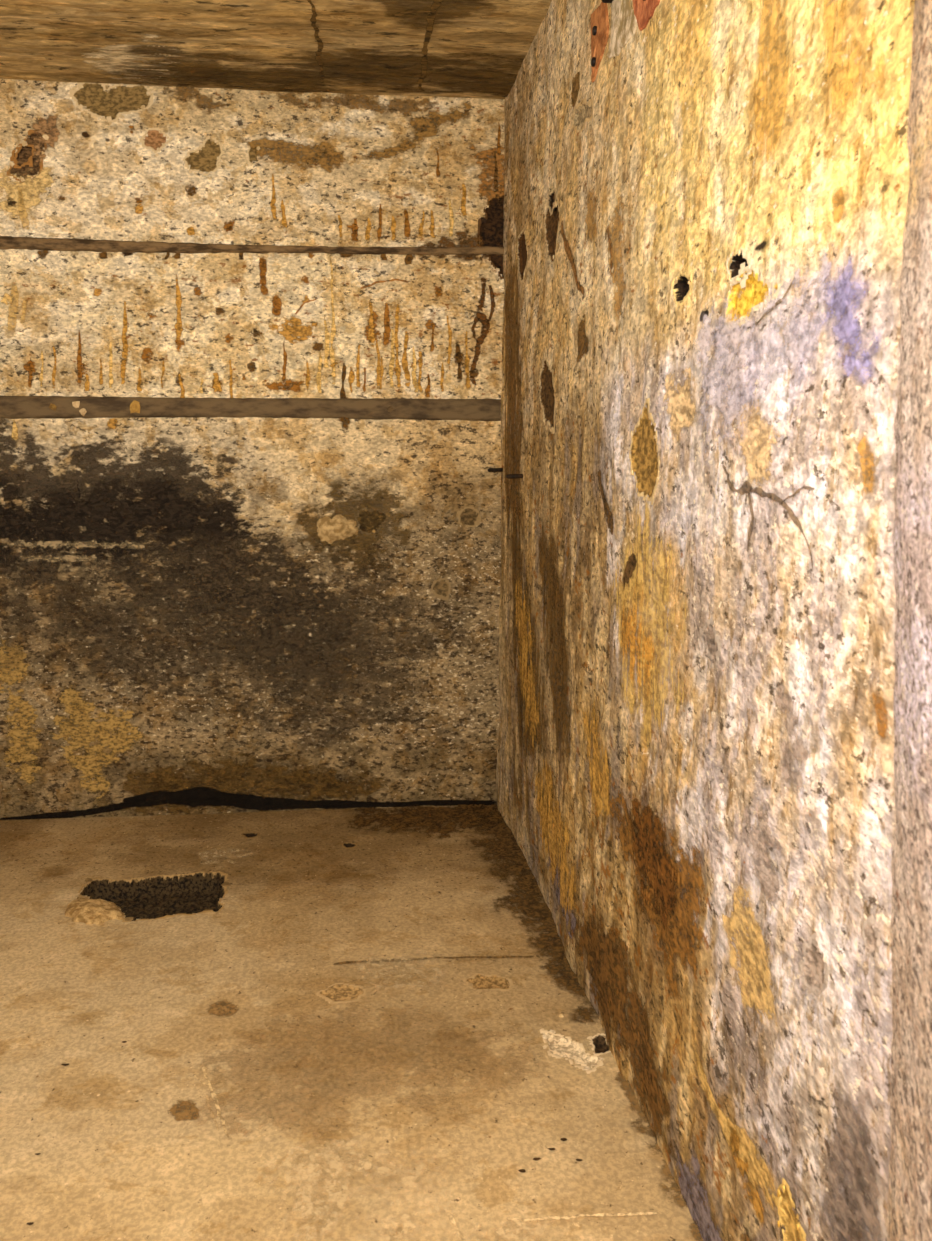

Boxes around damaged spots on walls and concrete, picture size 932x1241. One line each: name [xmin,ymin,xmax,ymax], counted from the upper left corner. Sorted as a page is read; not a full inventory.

crack [307,0,325,83]
rust [270,174,287,228]
rust [24,346,56,388]
rust [76,301,185,398]
rust [175,275,202,351]
rust [200,183,479,398]
crack [723,465,814,577]
water stain [0,267,611,1023]
water stain [744,801,781,906]
water stain [722,887,777,1024]
water stain [615,1072,723,1241]
water stain [696,1053,775,1223]